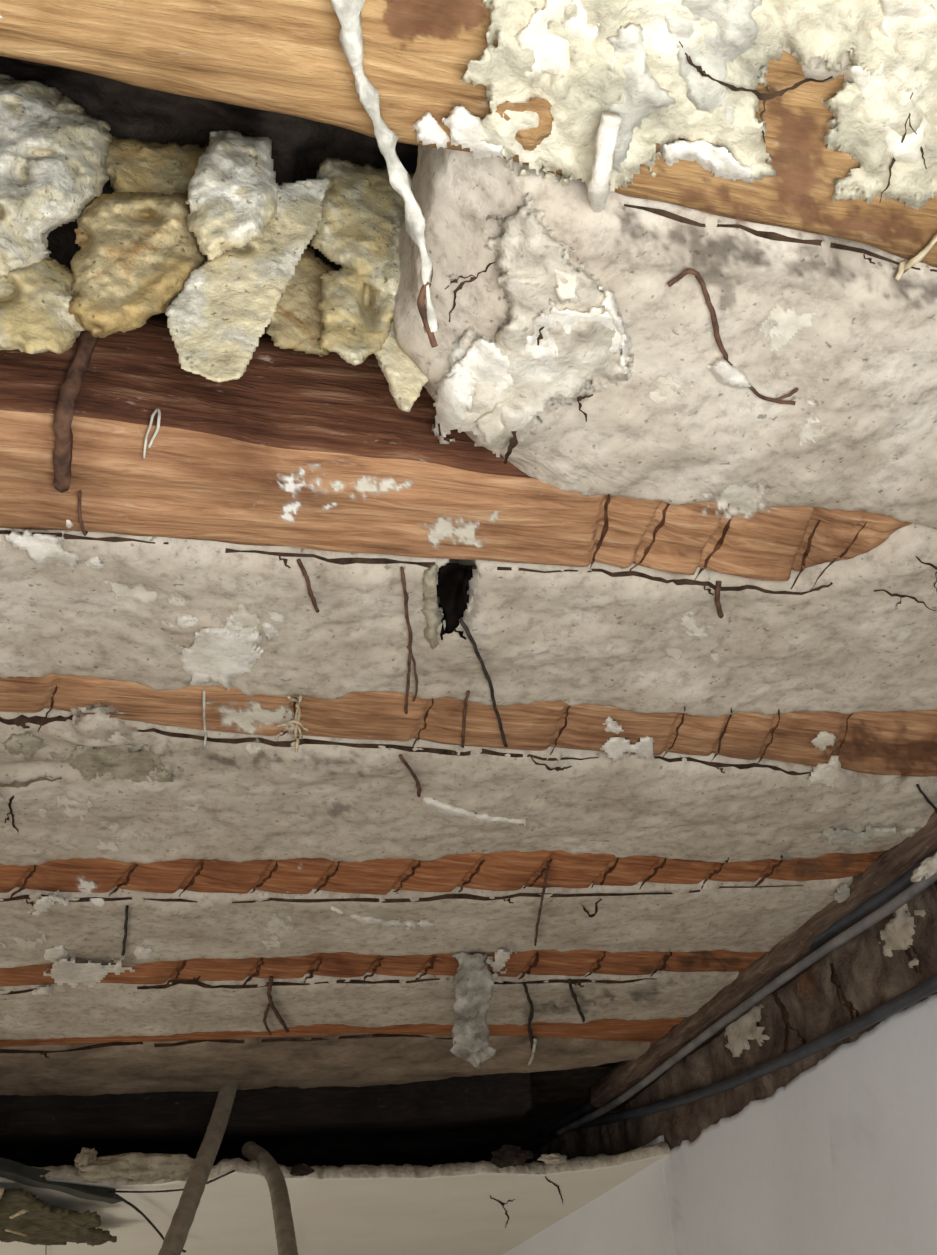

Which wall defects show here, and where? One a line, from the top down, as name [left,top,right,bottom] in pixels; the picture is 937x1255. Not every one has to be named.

flaking render [413,0,937,210]
flaking render [431,192,636,464]
peeling [281,501,301,522]
flaking render [5,520,104,569]
hole [421,563,473,650]
crack [874,556,937,611]
flaking render [161,592,284,691]
spalling [4,731,184,793]
flaking render [600,717,655,763]
flaking render [807,731,841,789]
flaking render [31,945,152,996]
crack [490,1195,515,1228]